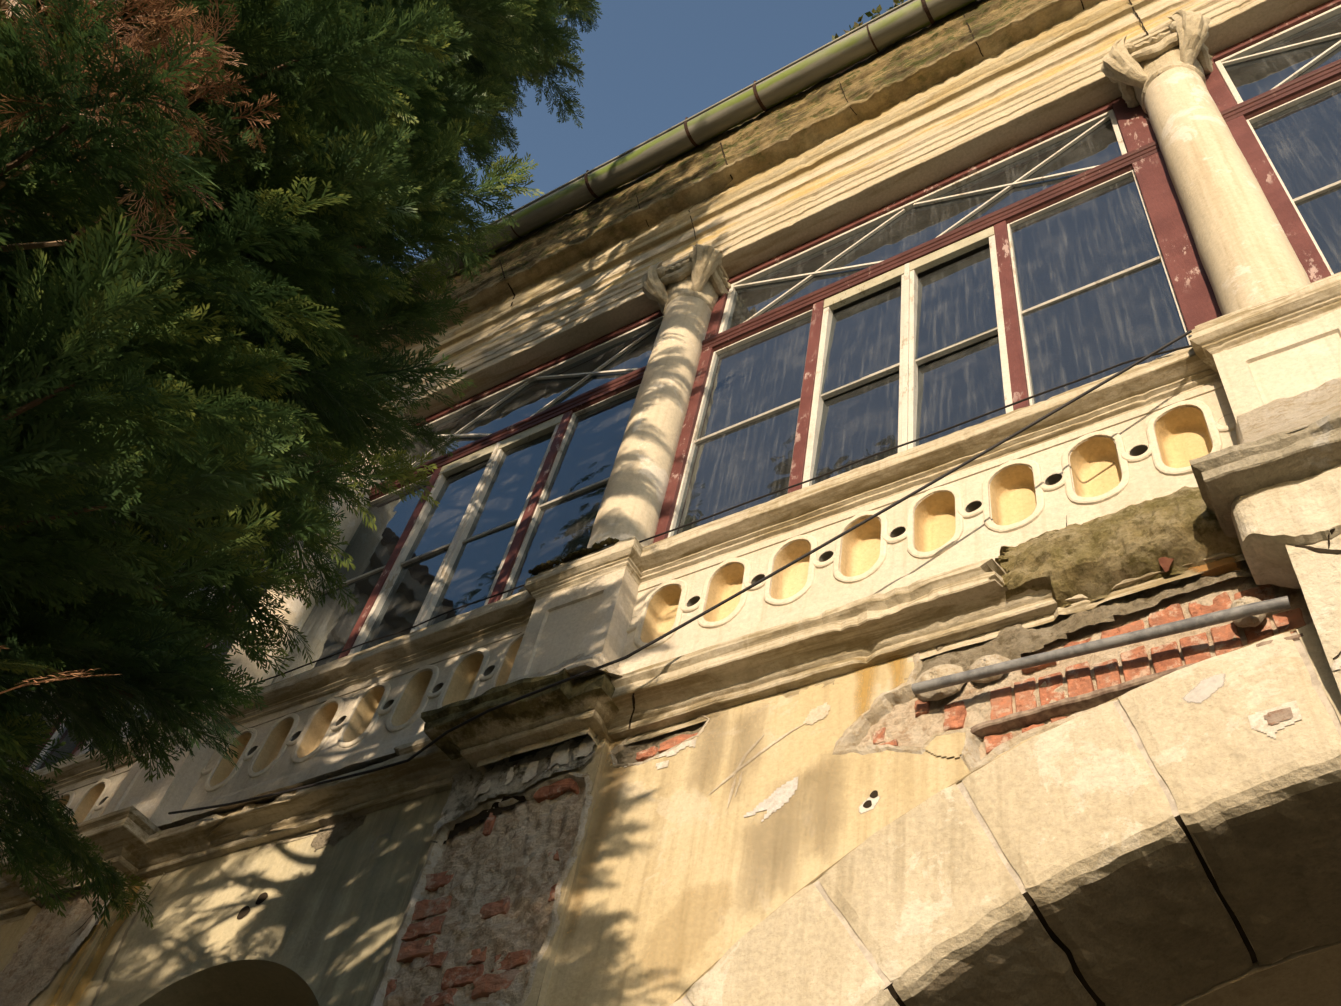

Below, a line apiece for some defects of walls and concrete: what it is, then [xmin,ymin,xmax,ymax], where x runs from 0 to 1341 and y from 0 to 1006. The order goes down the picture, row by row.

crack [1295,528,1341,554]
damp [860,668,872,714]
spalling [832,560,1314,772]
spalling [370,715,710,1006]